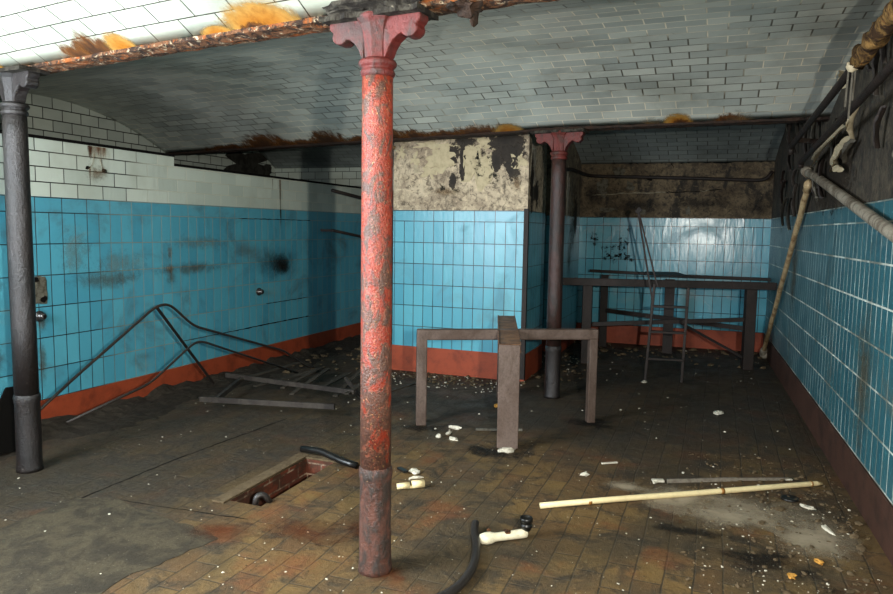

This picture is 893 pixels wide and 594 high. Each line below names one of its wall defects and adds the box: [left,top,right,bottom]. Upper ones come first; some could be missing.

rust [202,1,300,35]
spalling [322,0,420,15]
rust [61,34,135,58]
peeling [396,137,496,192]
mould [591,229,633,262]